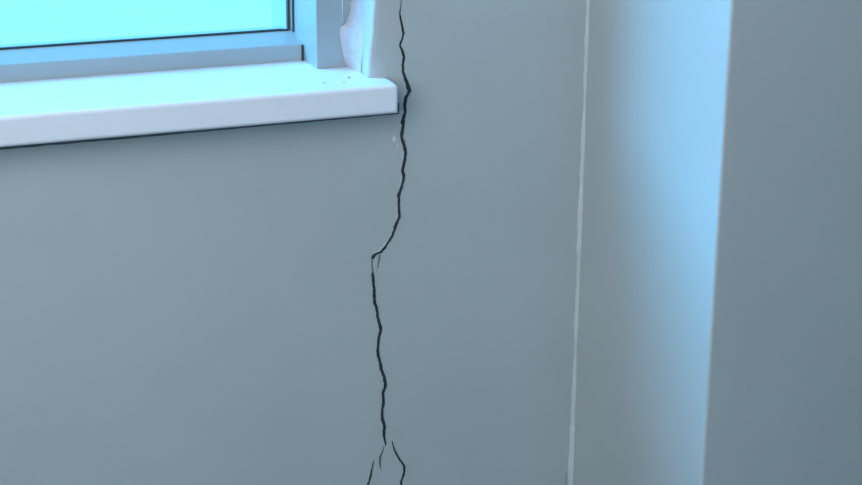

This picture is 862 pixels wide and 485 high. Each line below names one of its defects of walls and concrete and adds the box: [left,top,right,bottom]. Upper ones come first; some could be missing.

crack [0,0,412,485]